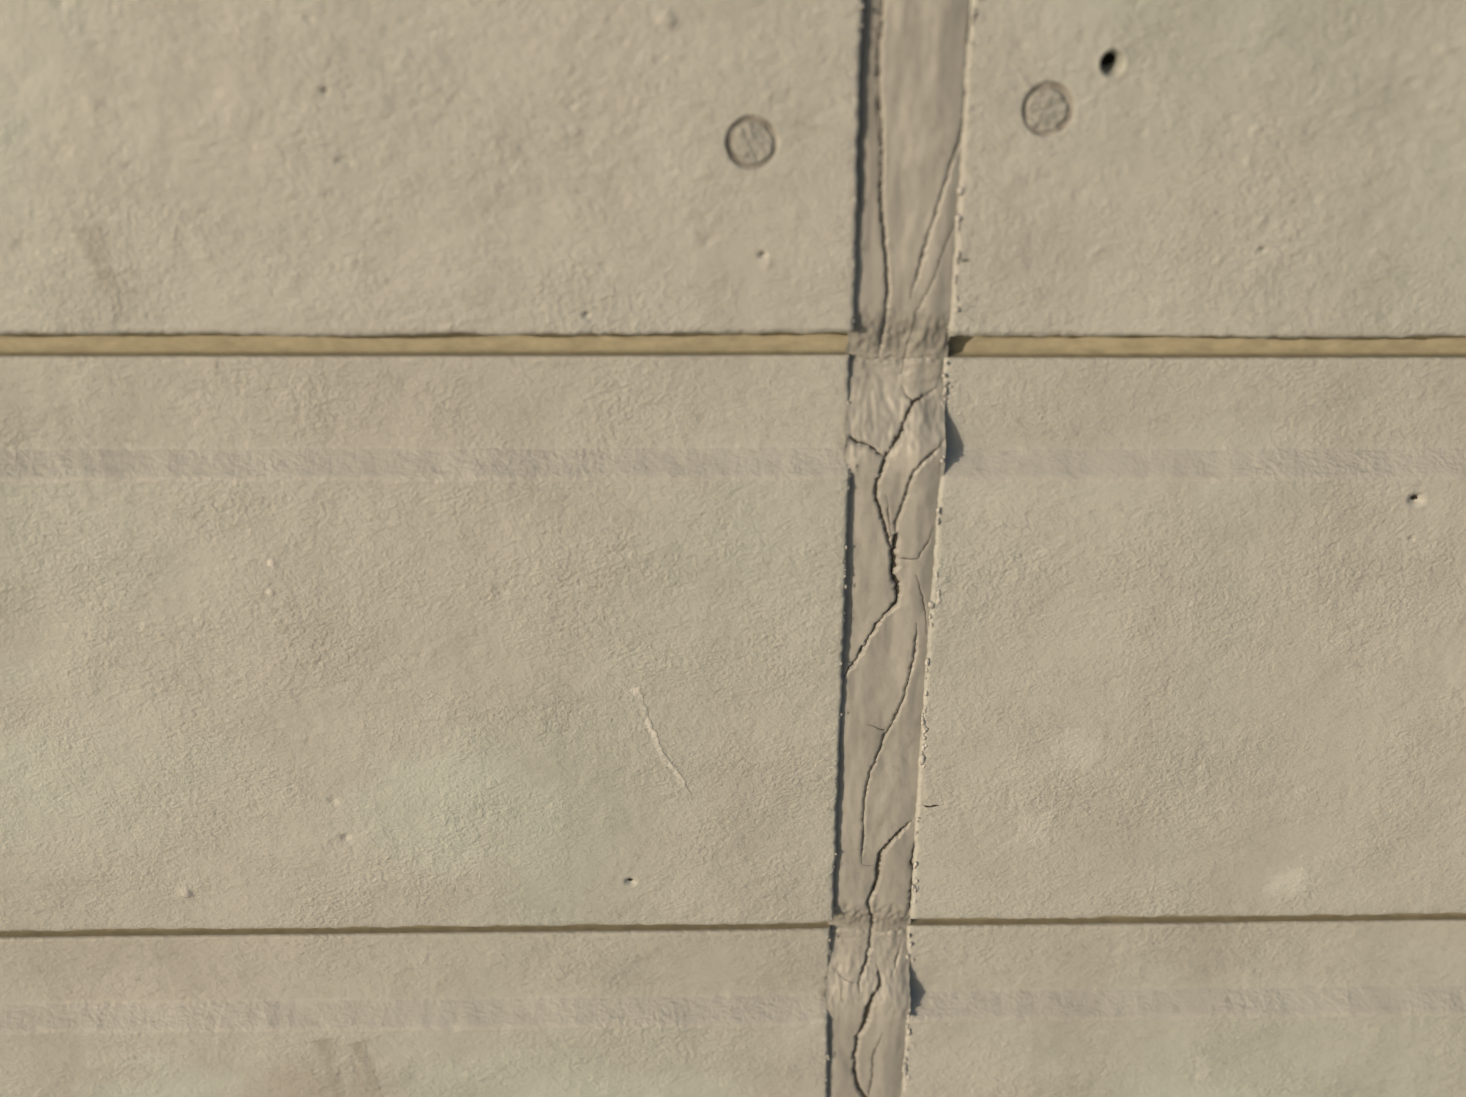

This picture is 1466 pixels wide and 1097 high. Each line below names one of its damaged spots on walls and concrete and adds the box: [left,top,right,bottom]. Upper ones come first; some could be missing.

crack [834,0,970,1097]